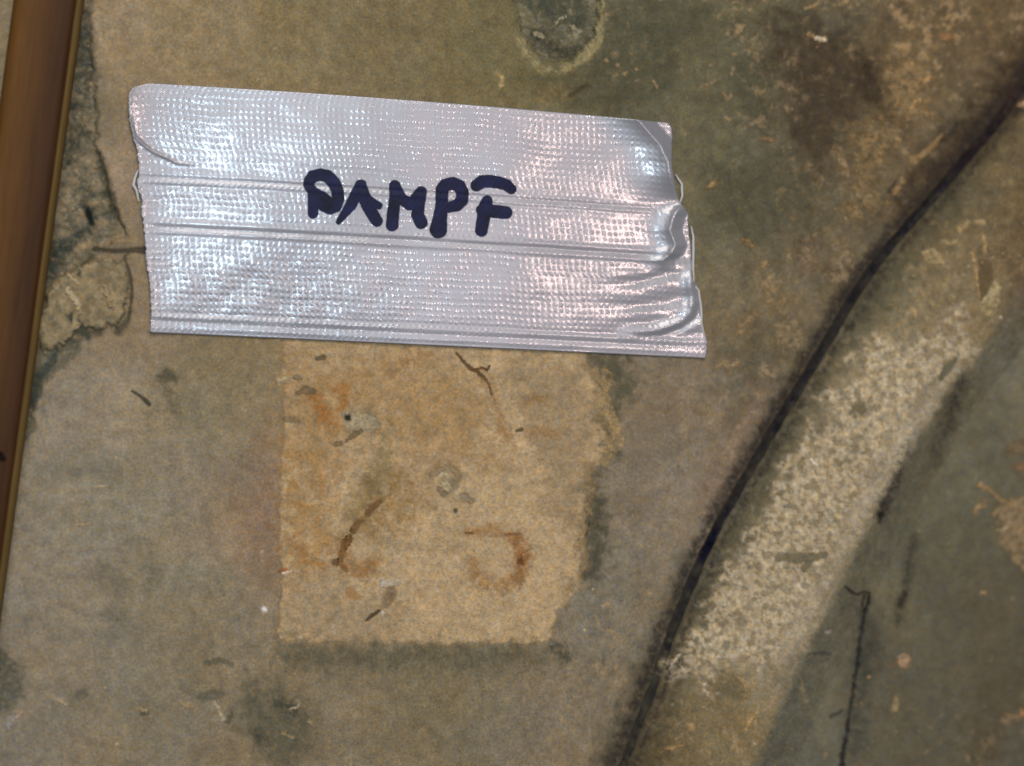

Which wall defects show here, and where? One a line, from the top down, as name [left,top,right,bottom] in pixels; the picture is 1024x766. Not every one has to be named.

spalling [44,0,126,302]
rust [473,526,528,588]